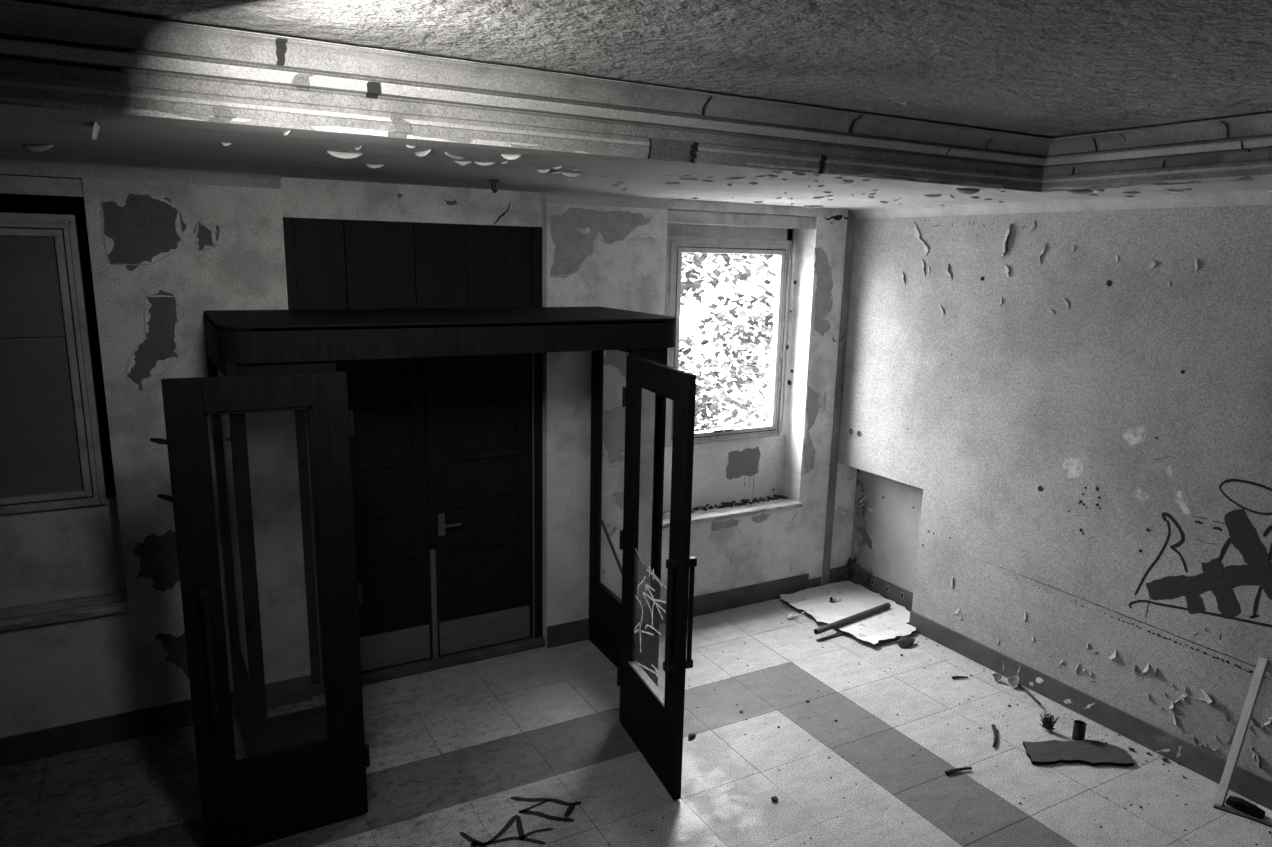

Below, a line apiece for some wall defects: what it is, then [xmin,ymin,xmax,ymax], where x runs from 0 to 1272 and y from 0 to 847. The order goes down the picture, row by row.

peeling [327,145,384,168]
peeling [406,145,521,166]
peeling [537,166,627,191]
peeling [100,193,222,271]
peeling [549,206,660,278]
peeling [125,290,179,393]
peeling [134,529,180,592]
peeling [155,632,189,680]
peeling [1147,683,1272,776]